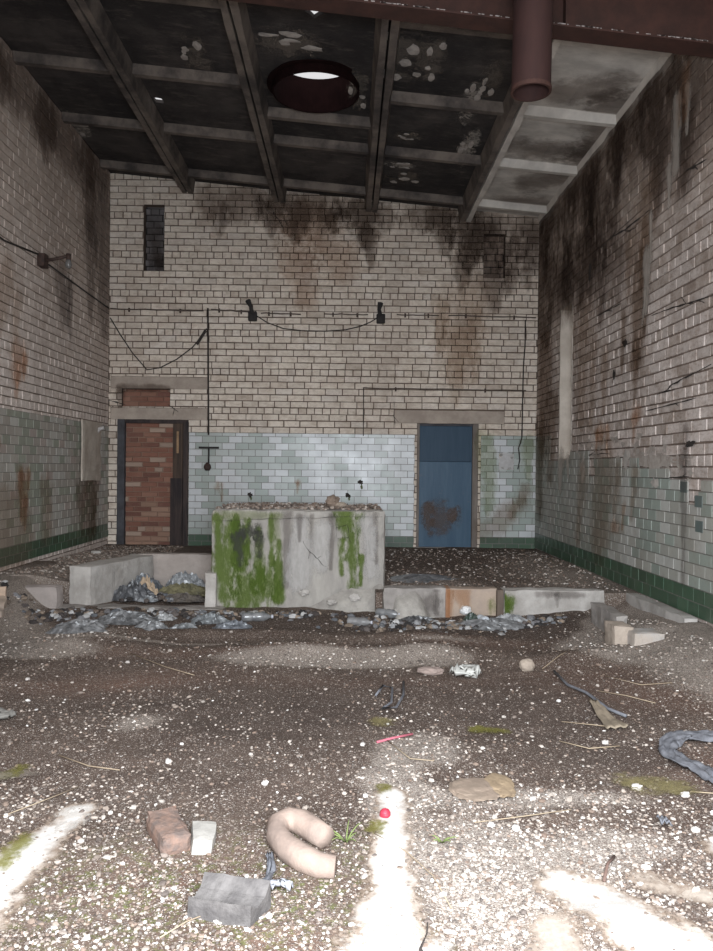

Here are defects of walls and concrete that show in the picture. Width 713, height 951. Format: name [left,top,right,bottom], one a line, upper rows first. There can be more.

peeling [180,36,212,70]
peeling [253,30,322,59]
peeling [383,31,447,82]
peeling [465,61,505,101]
water stain [667,82,691,209]
water stain [642,210,652,324]
water stain [230,513,346,605]
water stain [355,514,379,586]
crack [419,922,428,951]